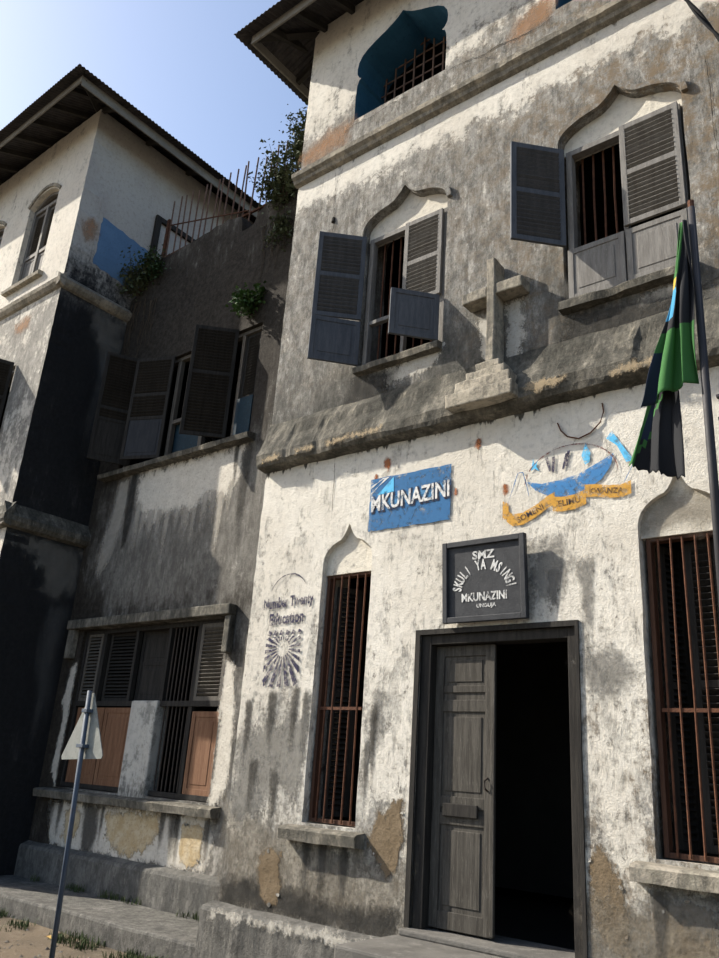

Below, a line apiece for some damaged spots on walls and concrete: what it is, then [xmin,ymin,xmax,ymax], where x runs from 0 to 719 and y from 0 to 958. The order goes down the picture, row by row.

crack [704,55,719,154]
leakage [97,474,137,576]
leakage [234,445,252,516]
flaking render [50,663,77,785]
flaking render [208,661,236,807]
leakage [227,688,314,823]
leakage [361,689,386,787]
flaking render [49,799,213,873]
flaking render [257,847,282,907]
flaking render [210,907,371,947]
leakage [219,842,399,937]
flaking render [367,798,406,880]